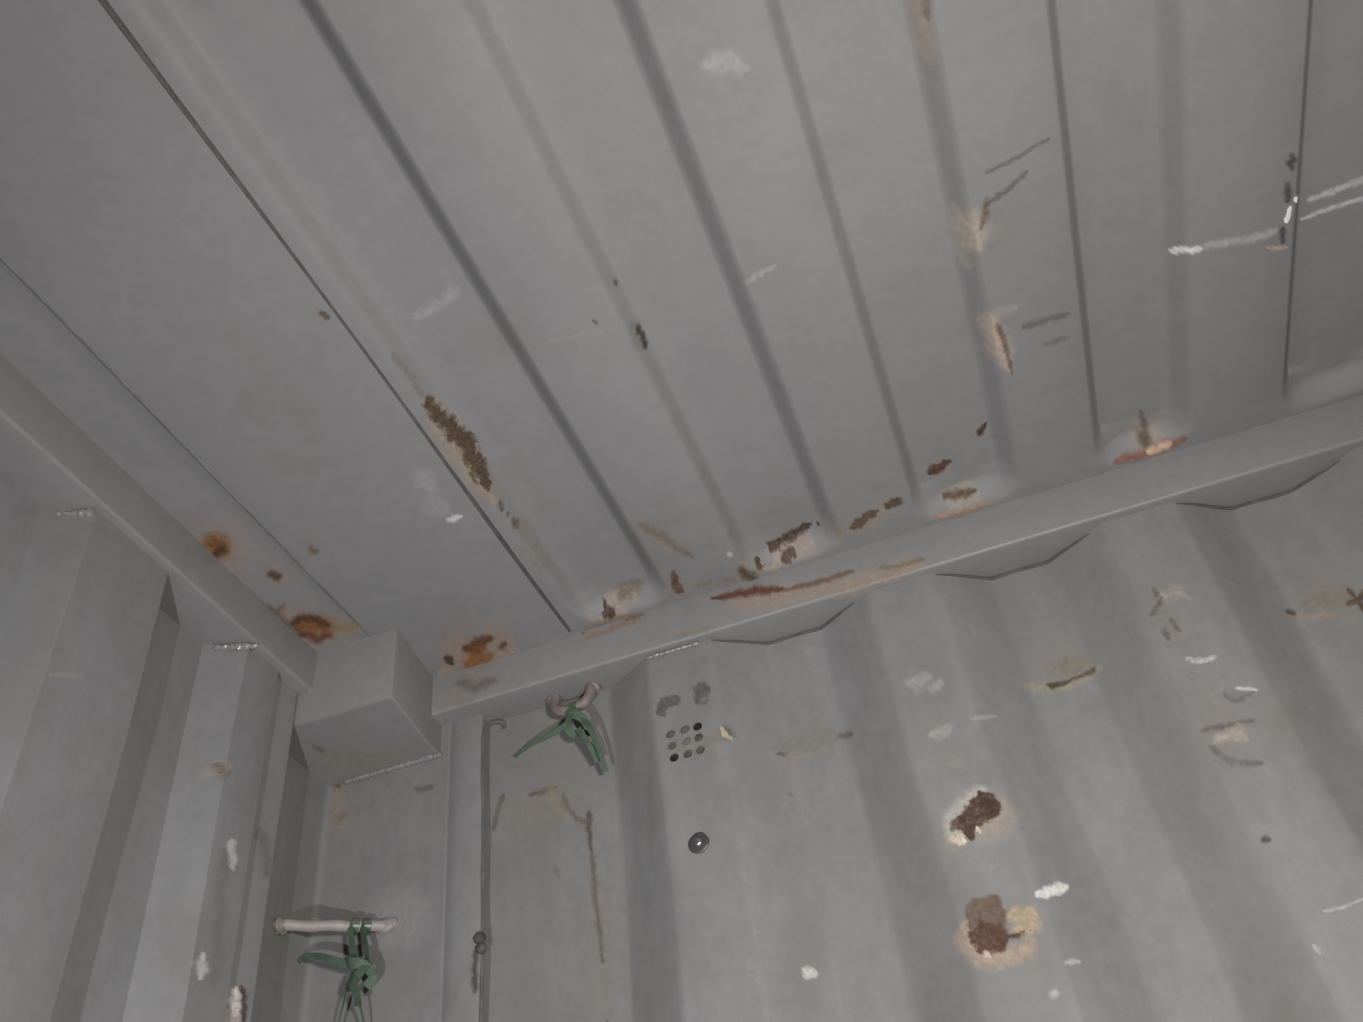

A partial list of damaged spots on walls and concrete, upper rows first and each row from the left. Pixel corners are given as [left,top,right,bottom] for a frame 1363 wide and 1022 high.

rust [1115,414,1187,464]
rust [205,535,228,557]
rust [711,567,854,600]
rust [291,615,332,643]
rust [444,636,507,669]